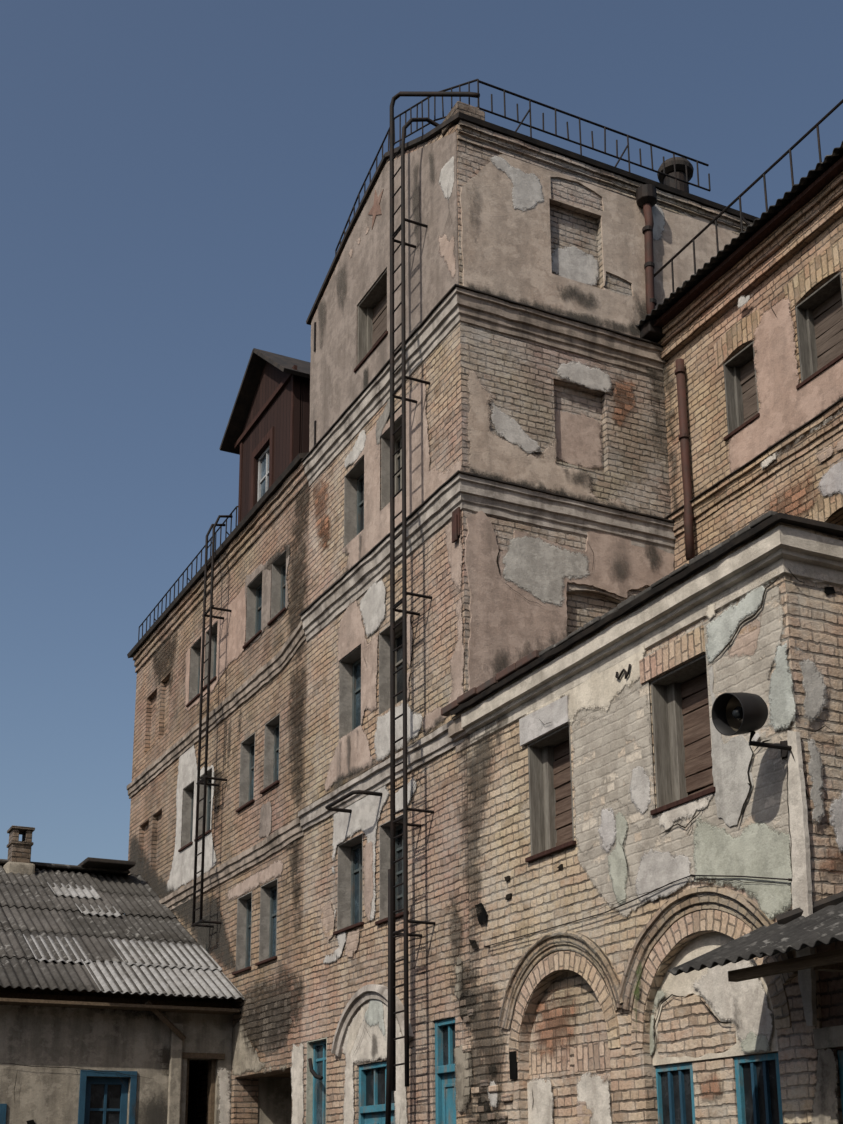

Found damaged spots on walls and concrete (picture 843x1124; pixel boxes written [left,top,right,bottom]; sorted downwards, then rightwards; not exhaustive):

flaking render [342,357,645,569]
peeling [817,439,843,496]
flaking render [167,745,216,891]
peeling [526,576,826,918]
crack [590,740,792,912]
flaking render [808,739,843,873]
leakage [449,717,774,1124]
leakage [239,967,304,1052]
flaking render [454,1045,517,1124]
spalling [650,990,769,1059]